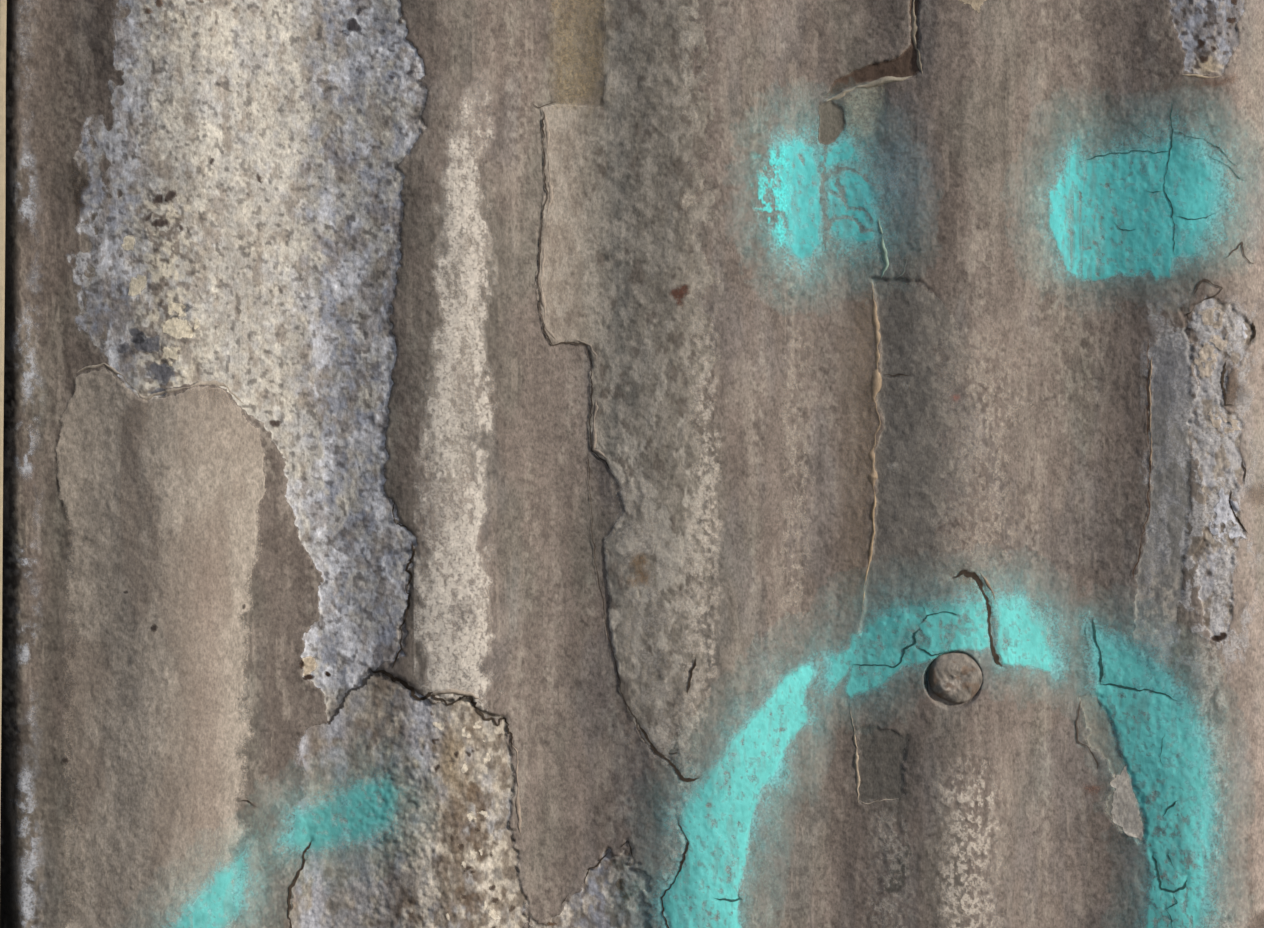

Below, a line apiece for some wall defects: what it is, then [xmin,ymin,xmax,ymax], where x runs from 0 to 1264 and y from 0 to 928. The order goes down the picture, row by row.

spalling [819,0,922,145]
peeling [1170,0,1245,79]
crack [1087,103,1244,257]
peeling [535,0,721,755]
peeling [56,0,651,928]
crack [854,570,1002,668]
peeling [1133,295,1259,928]
spalling [1079,694,1147,844]
crack [1076,621,1180,769]